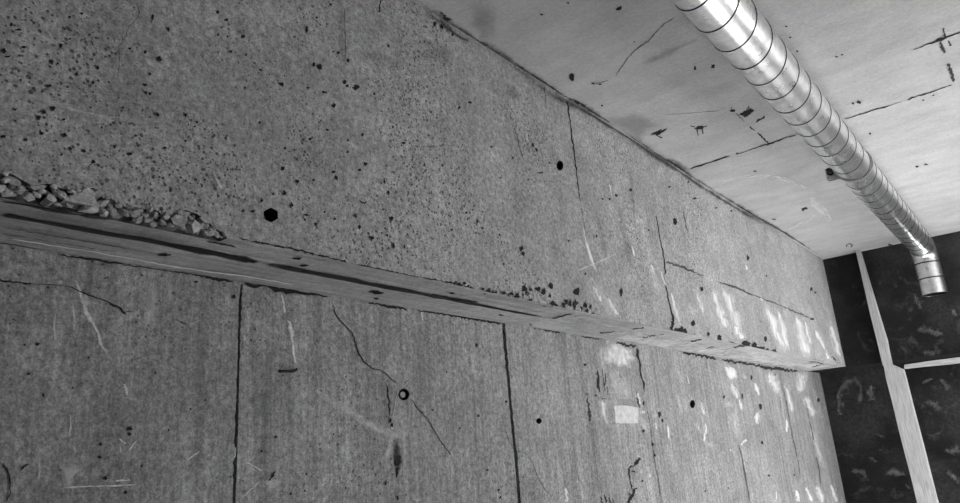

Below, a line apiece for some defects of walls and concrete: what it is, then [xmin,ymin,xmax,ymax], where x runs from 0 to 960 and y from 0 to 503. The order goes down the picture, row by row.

crack [509,19,672,122]
spalling [0,170,226,238]
crack [0,279,132,315]
crack [333,305,452,456]
water stain [713,282,841,432]
crack [627,457,641,503]